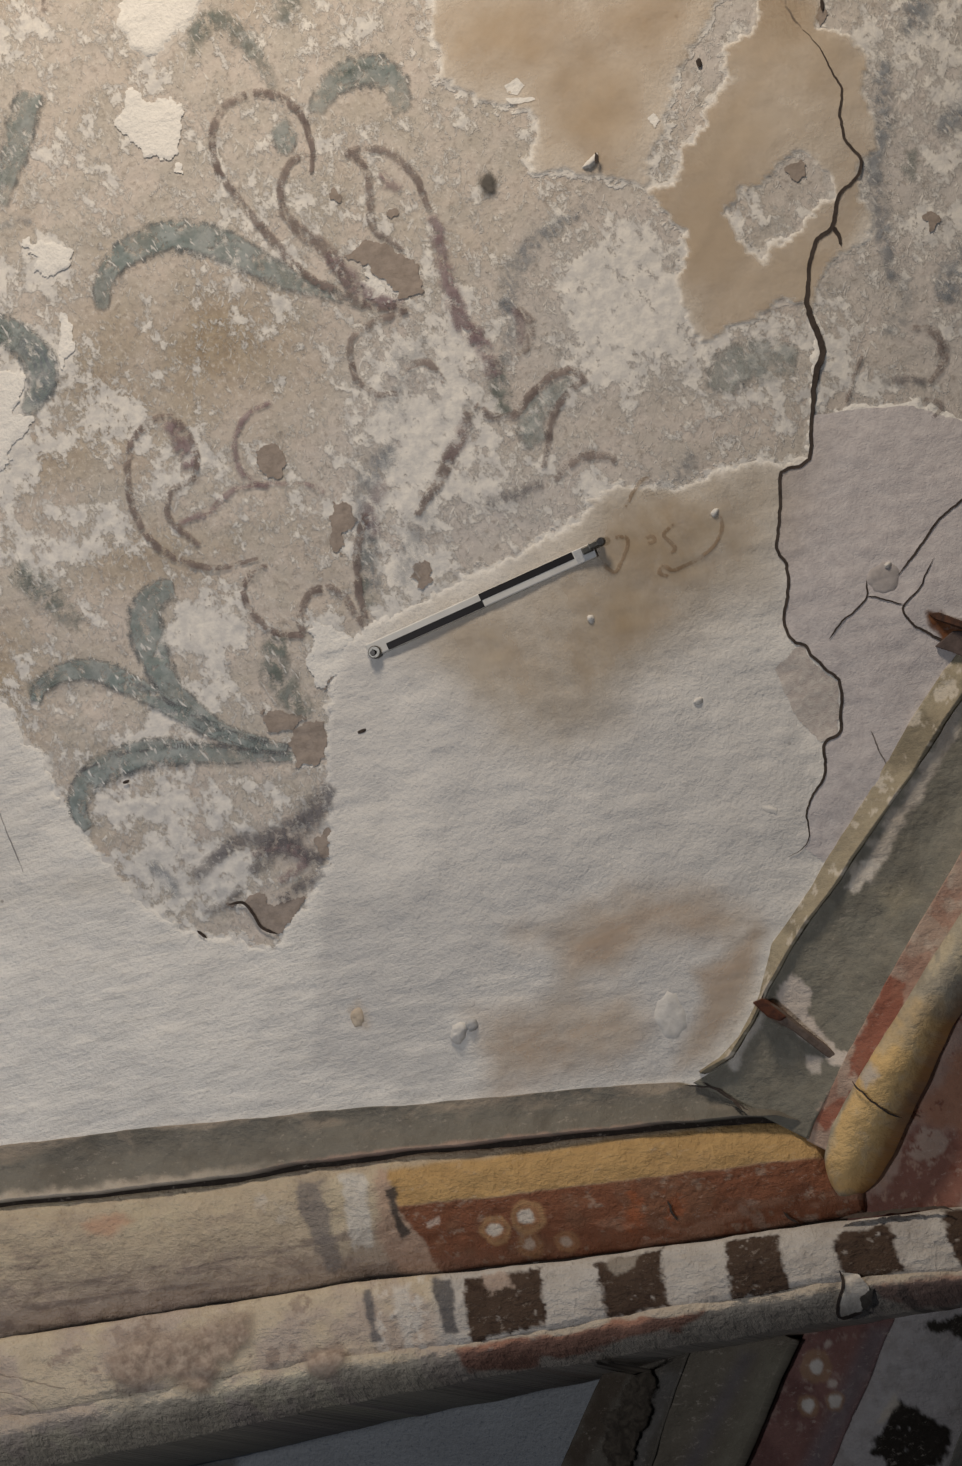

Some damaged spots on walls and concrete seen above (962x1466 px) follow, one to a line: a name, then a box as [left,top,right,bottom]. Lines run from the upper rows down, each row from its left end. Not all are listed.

leakage [480,173,495,194]
leakage [450,0,685,169]
leakage [656,0,865,331]
flaking render [0,0,962,950]
leakage [565,491,746,686]
crack [775,15,962,857]